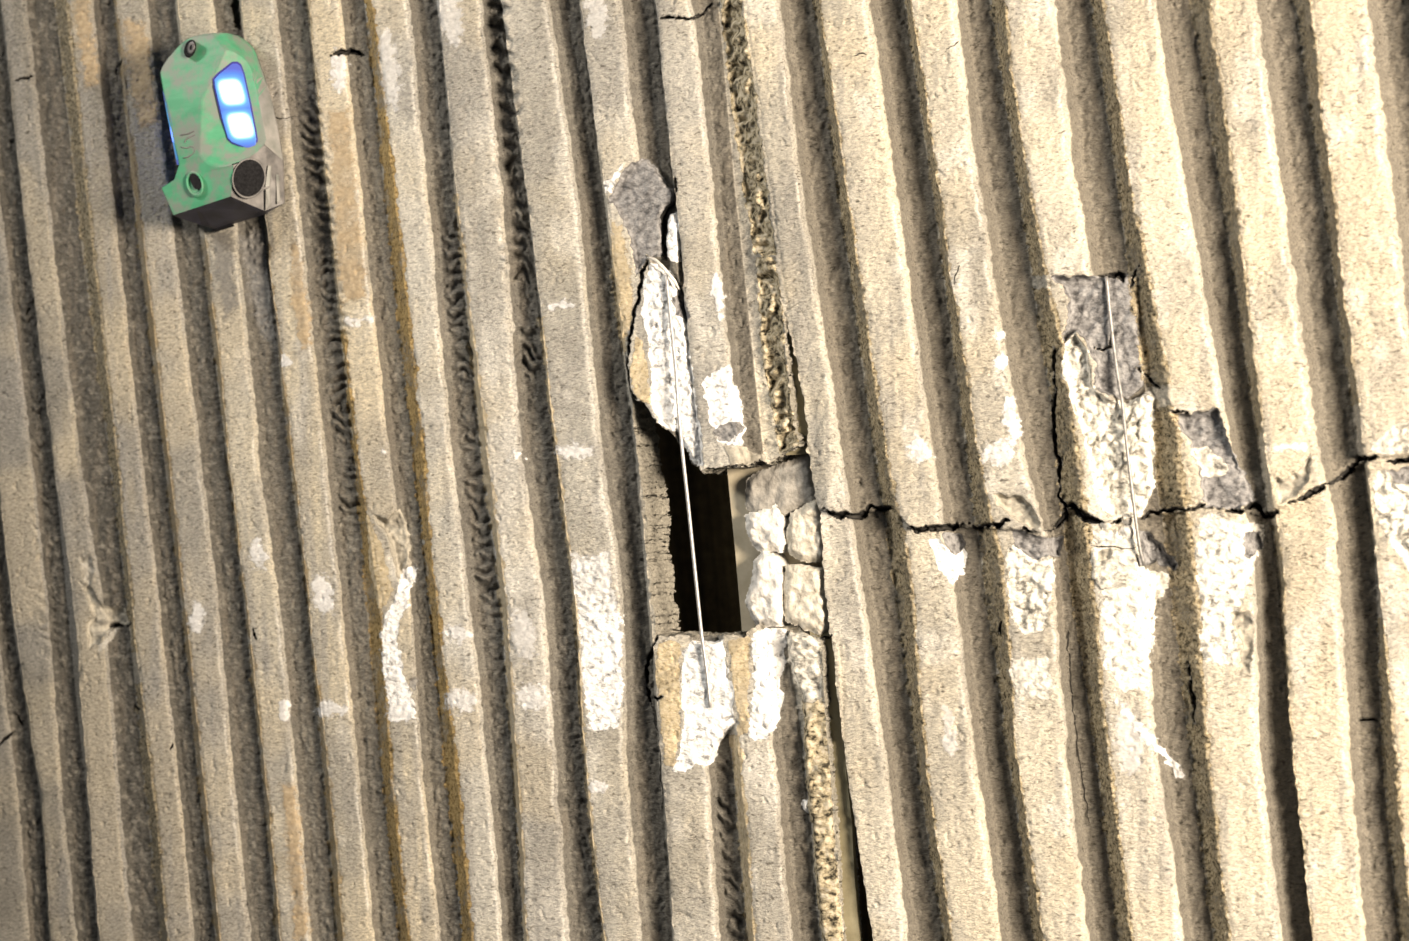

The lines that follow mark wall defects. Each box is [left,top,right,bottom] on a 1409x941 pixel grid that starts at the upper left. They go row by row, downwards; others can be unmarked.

crack [661,3,712,20]
spalling [603,158,766,466]
spalling [1051,274,1178,693]
crack [828,348,1409,549]
spalling [1178,407,1265,675]
spalling [672,627,822,772]